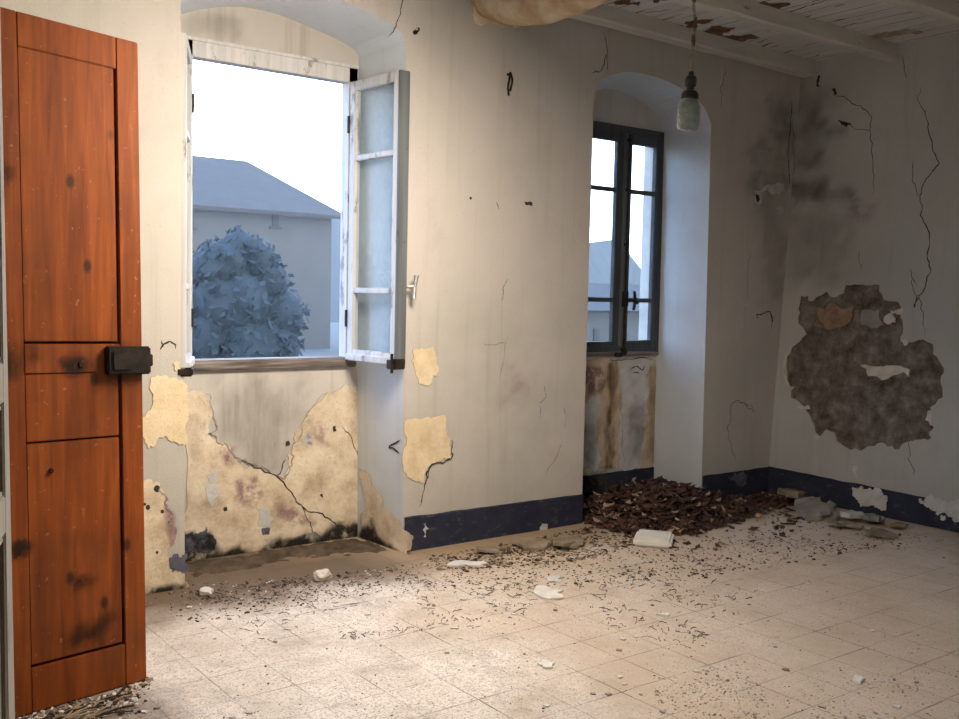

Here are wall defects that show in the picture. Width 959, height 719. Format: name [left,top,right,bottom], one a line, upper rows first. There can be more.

peeling [607,0,670,13]
peeling [678,19,775,47]
peeling [757,0,825,17]
crack [841,96,874,191]
crack [902,57,939,337]
flaking render [412,346,439,386]
flaking render [783,285,944,451]
flaking render [143,359,428,597]
crack [235,457,346,534]
flaking render [402,415,454,485]
peeling [852,465,888,511]
peeling [919,493,959,522]